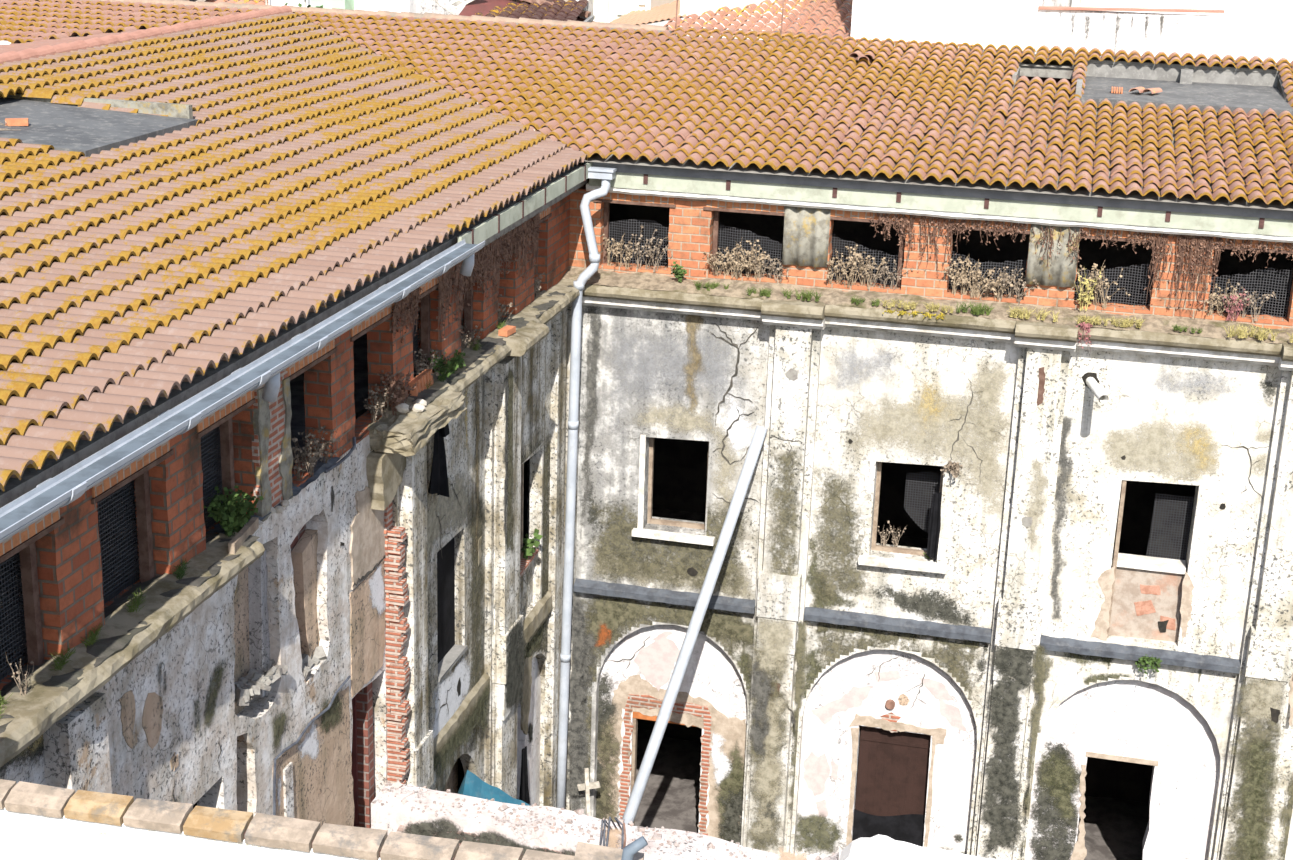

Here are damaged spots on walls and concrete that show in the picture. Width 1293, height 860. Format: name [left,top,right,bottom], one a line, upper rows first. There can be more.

flaking render [340,450,406,590]
water stain [580,306,753,594]
crack [710,323,807,491]
water stain [770,451,799,576]
crack [948,379,1005,477]
flaking render [119,690,163,749]
water stain [427,474,485,740]
flaking render [597,631,747,839]
flaking render [803,751,838,817]
flaking render [880,712,901,733]
water stain [814,474,1081,860]
water stain [1225,678,1283,860]